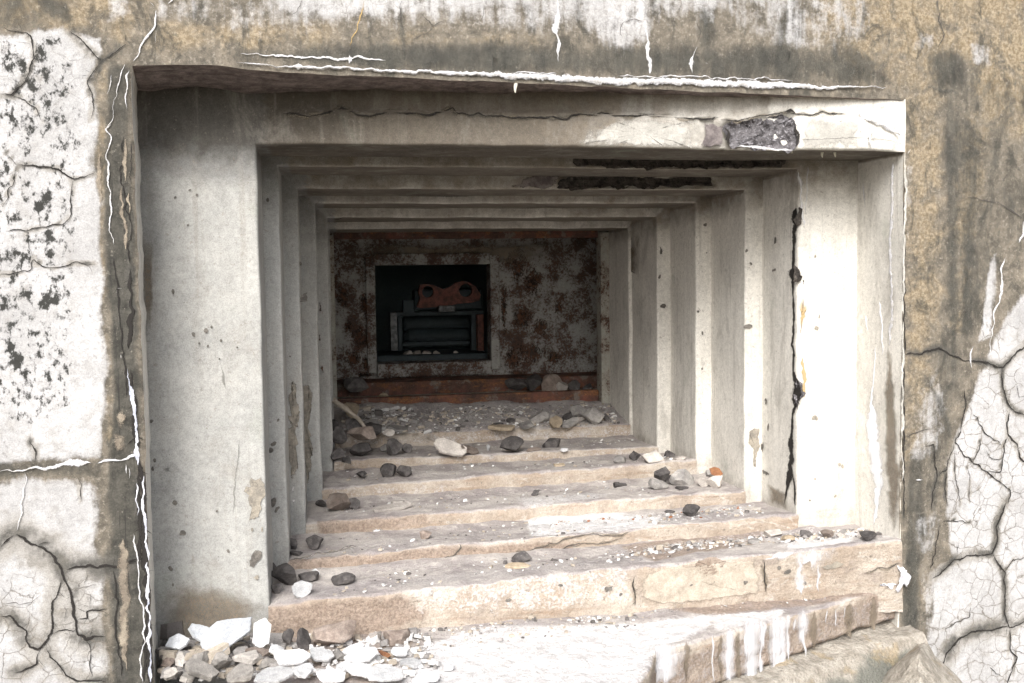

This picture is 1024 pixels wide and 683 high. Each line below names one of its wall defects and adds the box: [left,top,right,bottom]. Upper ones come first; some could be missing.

crack [4,26,42,120]
crack [284,106,891,141]
spalling [513,113,858,191]
corrosion [336,286,370,377]
corrosion [501,258,561,374]
crack [784,208,803,504]
damp [865,164,900,522]
damp [989,259,1005,356]
crack [2,136,153,683]
crack [899,281,1024,683]
damp [880,565,911,592]
damp [712,614,807,678]